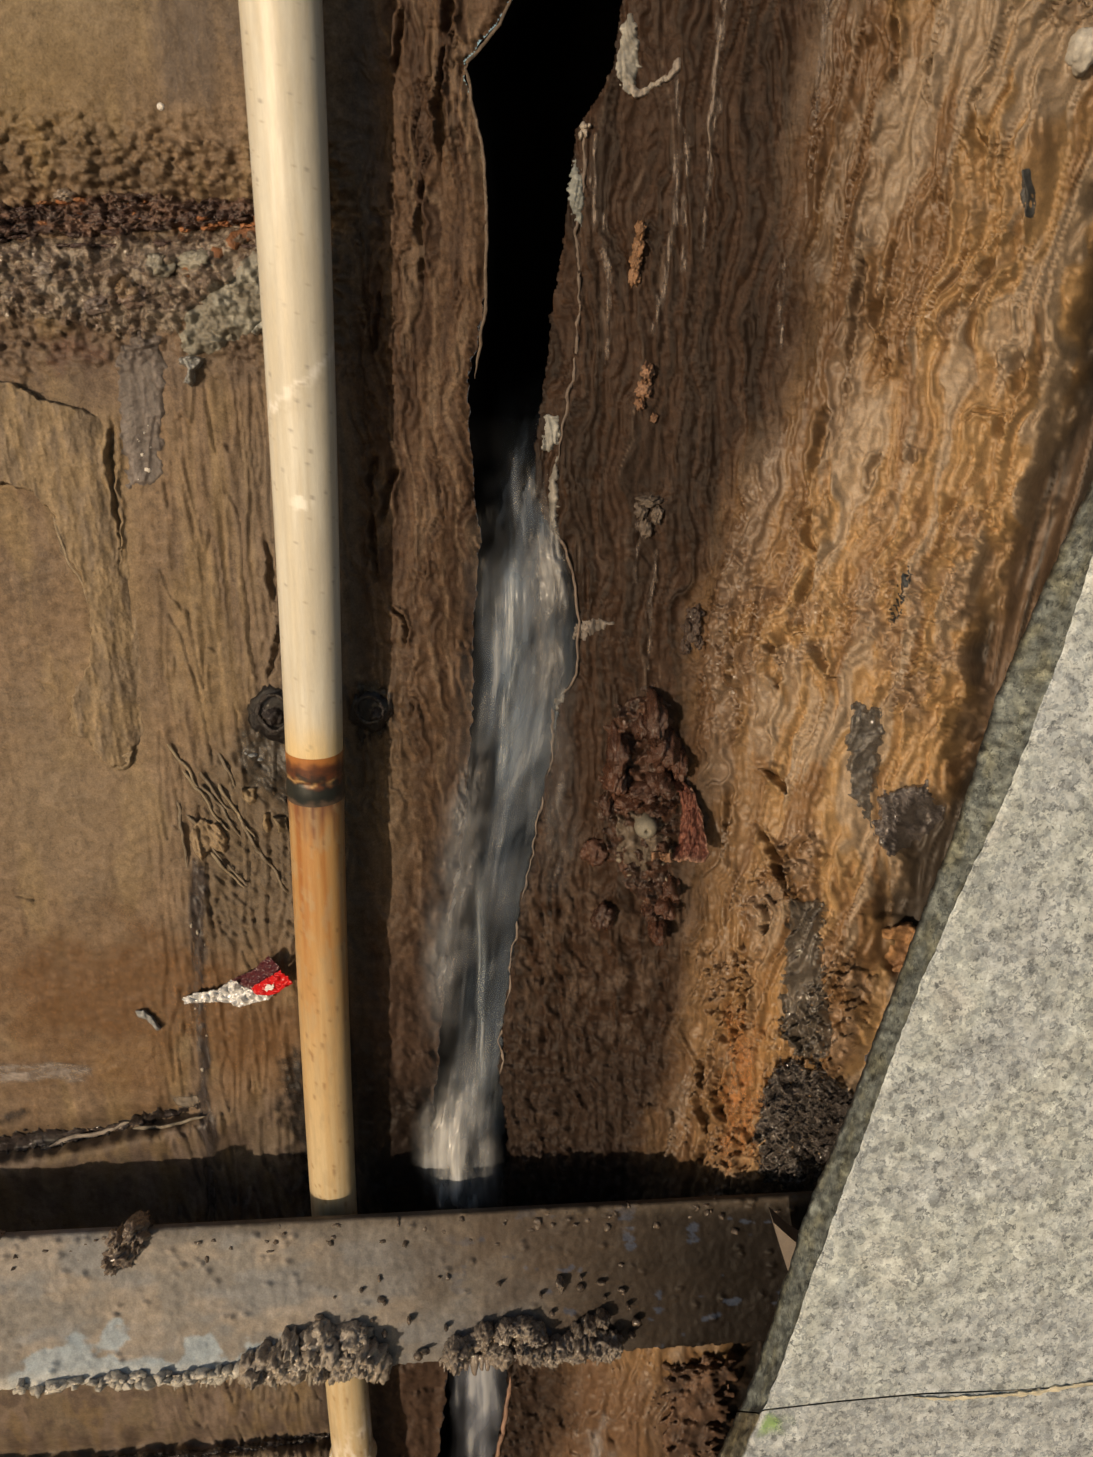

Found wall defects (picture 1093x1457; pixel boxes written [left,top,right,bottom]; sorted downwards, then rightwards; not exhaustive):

crack [430,0,681,1210]
leakage [495,0,831,1207]
crack [437,1368,511,1457]
leakage [492,1359,578,1457]
crack [767,1388,1044,1411]